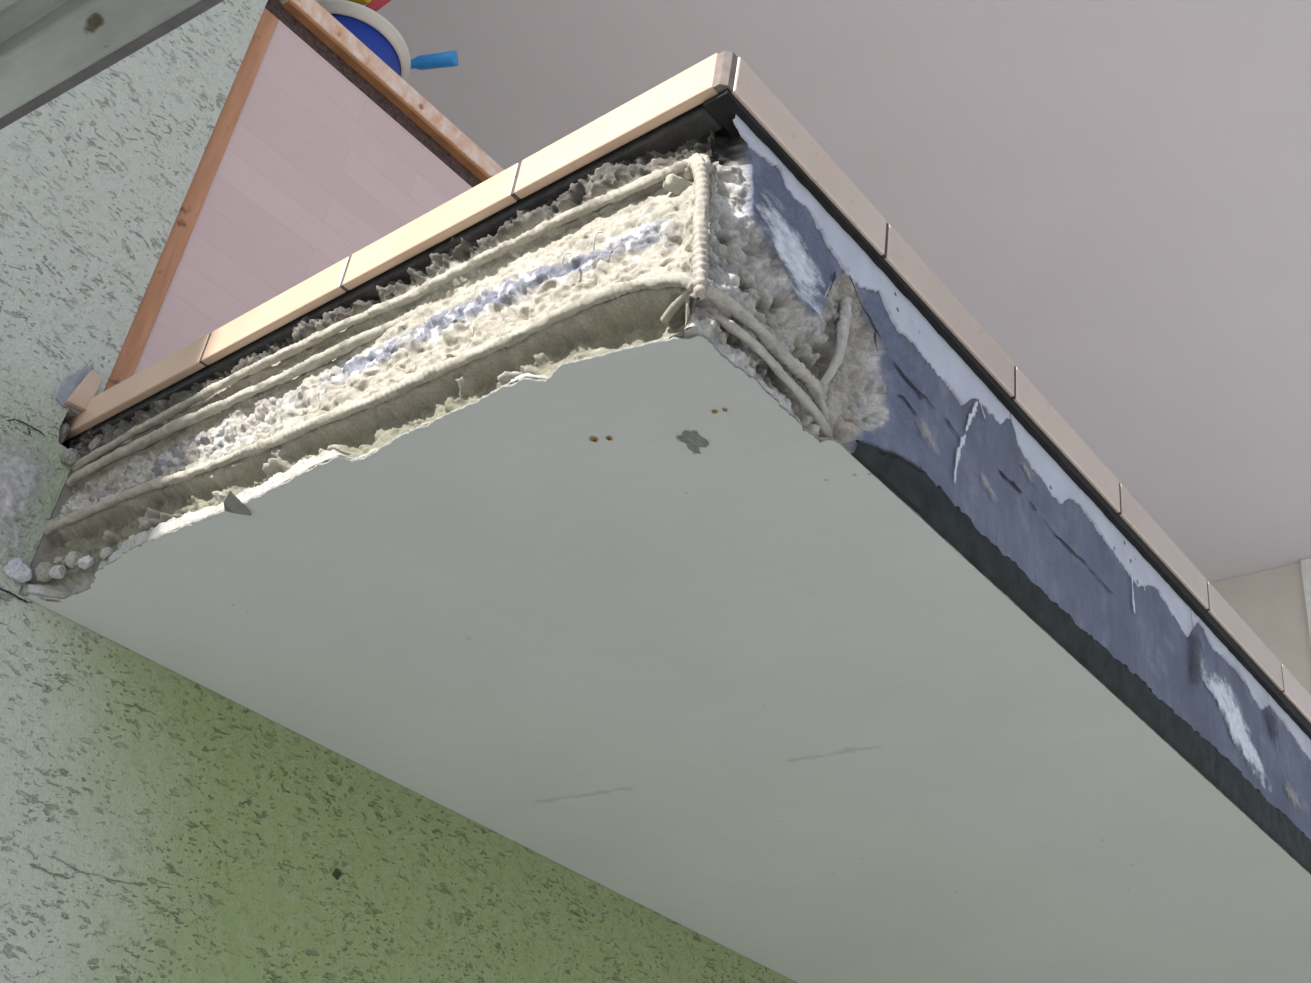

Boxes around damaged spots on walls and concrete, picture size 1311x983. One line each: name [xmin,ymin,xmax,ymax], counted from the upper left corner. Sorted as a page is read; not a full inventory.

crack [0,588,31,603]
spalling [3,114,1311,761]